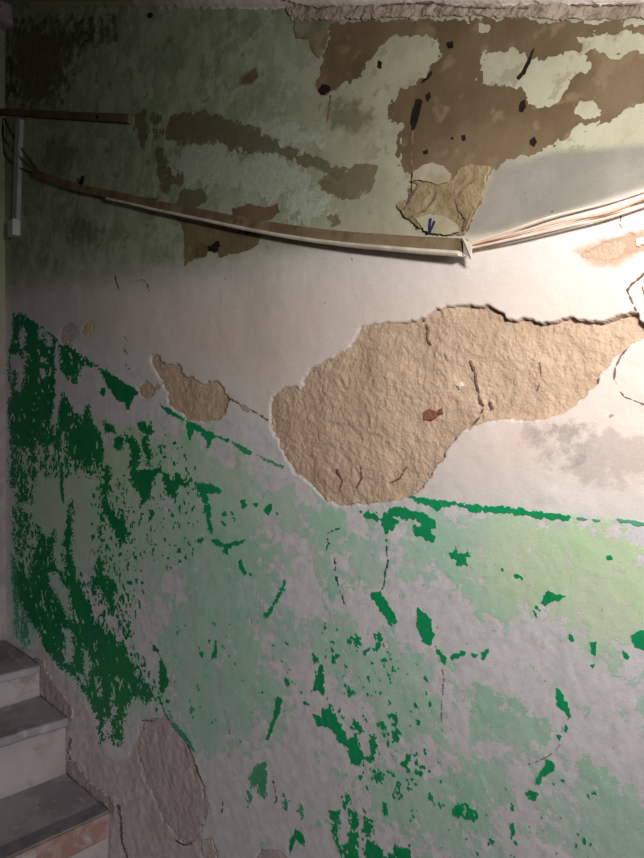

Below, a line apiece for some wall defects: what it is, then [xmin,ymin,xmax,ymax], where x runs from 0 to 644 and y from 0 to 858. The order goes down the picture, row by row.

leakage [5,13,118,110]
peeling [282,0,644,237]
leakage [133,109,378,227]
peeling [177,218,261,266]
crack [626,273,644,314]
crack [613,348,644,405]
spalling [6,307,644,858]